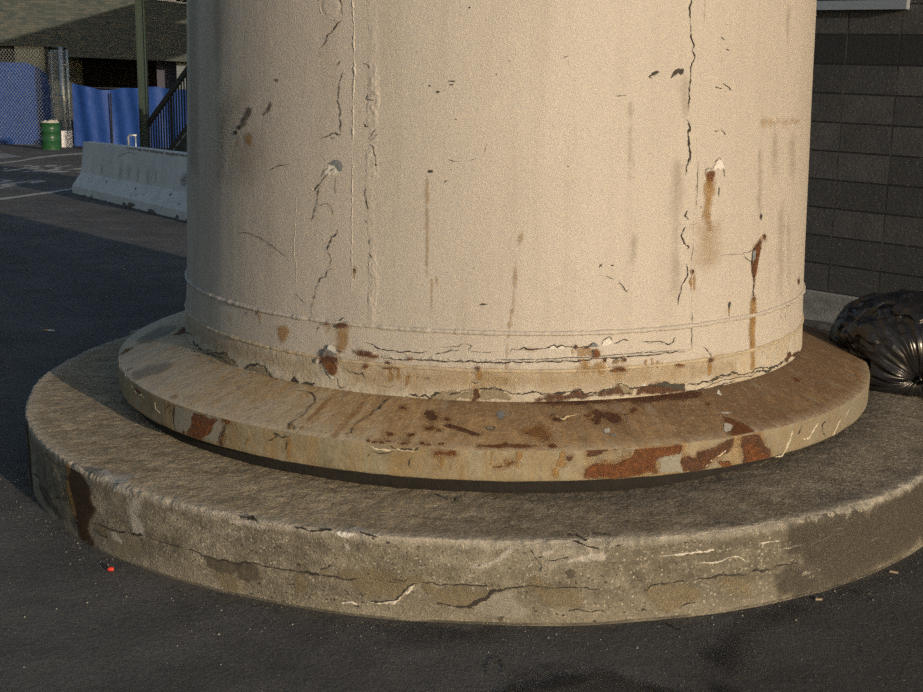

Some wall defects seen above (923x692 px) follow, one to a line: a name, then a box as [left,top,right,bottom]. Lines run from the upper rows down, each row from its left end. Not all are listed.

crack [681,0,696,173]
crack [672,211,690,320]
rust [727,234,766,369]
rust [173,405,230,447]
spalling [185,332,317,386]
crack [246,390,316,459]
peeling [316,345,343,389]
crack [351,342,490,434]
peeling [491,336,629,367]
spalling [396,347,801,401]
rust [536,392,700,425]
rust [585,412,771,479]